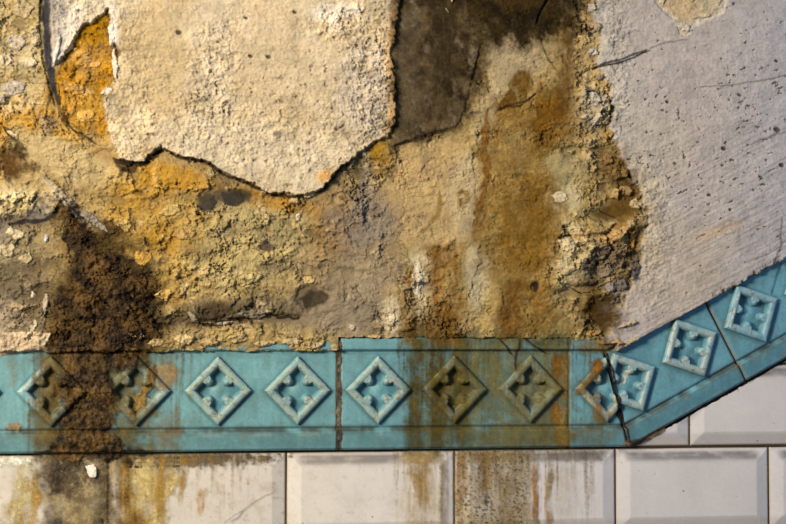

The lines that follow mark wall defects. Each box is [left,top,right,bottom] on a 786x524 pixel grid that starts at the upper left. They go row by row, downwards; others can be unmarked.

crack [40,0,96,144]
crack [113,148,356,199]
flaking render [0,0,650,352]
crack [393,128,448,146]
damp [389,0,588,149]
flaking render [654,0,729,36]
damp [27,202,183,524]
rust [397,246,558,524]
damp [457,62,620,449]
rust [576,340,624,425]
flaking render [715,260,782,328]
rust [114,453,291,524]